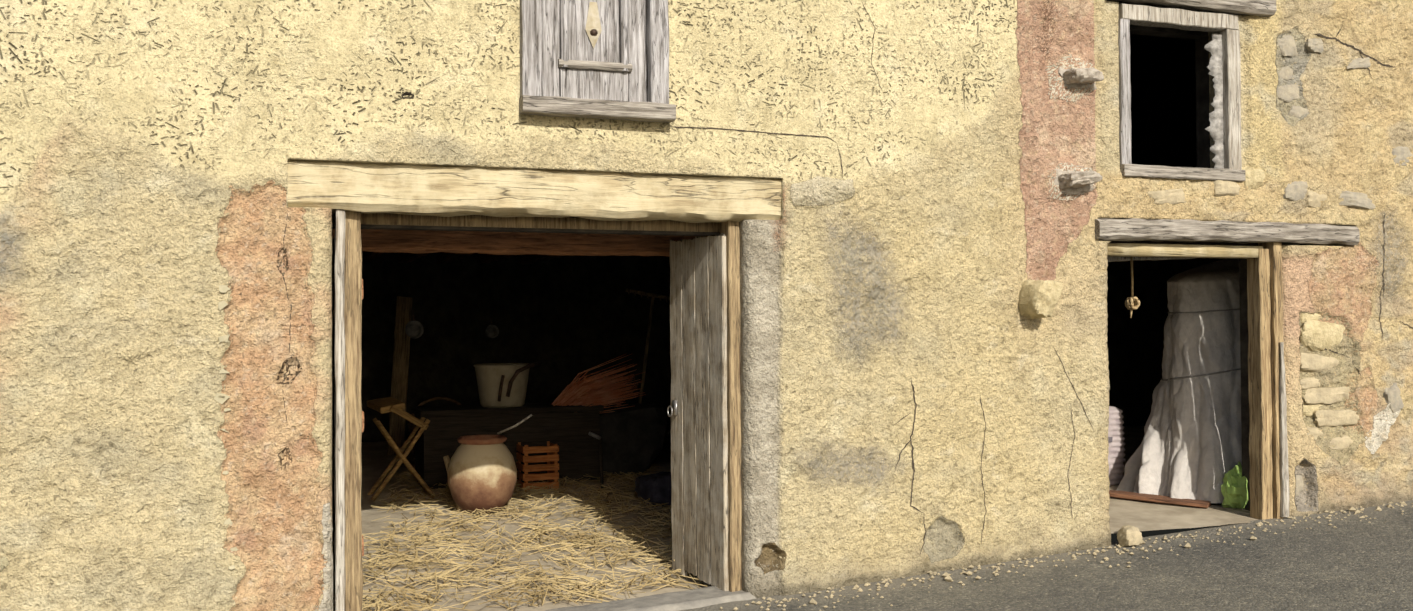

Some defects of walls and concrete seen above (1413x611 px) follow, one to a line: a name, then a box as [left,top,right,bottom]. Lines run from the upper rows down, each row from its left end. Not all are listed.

flaking render [1015,0,1098,281]
flaking render [214,180,328,611]
flaking render [754,542,787,574]
crack [893,381,926,556]
flaking render [923,516,965,563]
flaking render [1294,242,1379,512]